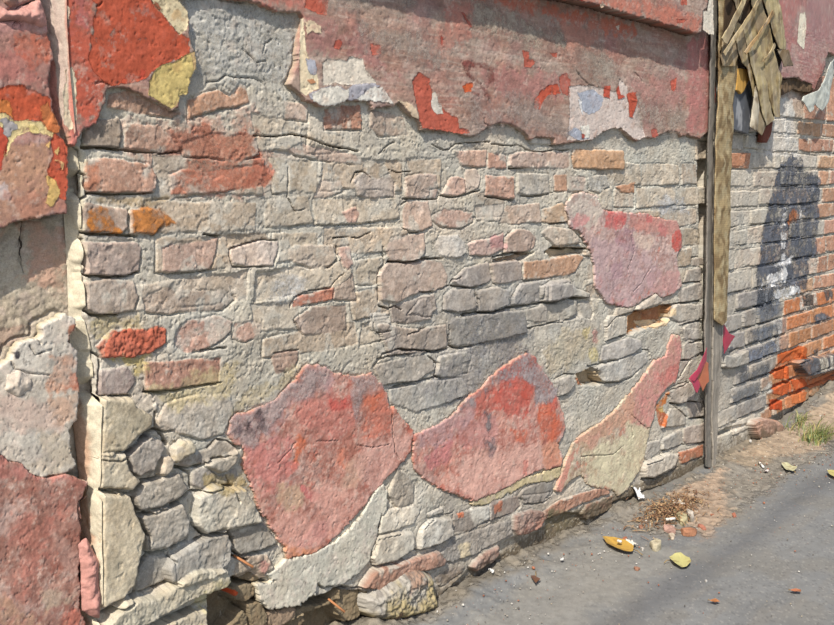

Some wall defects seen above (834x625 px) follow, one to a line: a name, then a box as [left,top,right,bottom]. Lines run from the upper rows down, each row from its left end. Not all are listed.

peeling [88,0,470,134]
peeling [522,50,535,67]
peeling [797,12,806,49]
peeling [0,67,77,207]
crack [259,134,353,151]
peeling [534,73,658,141]
spalling [104,327,166,358]
peeling [0,312,80,477]
peeling [206,191,682,625]